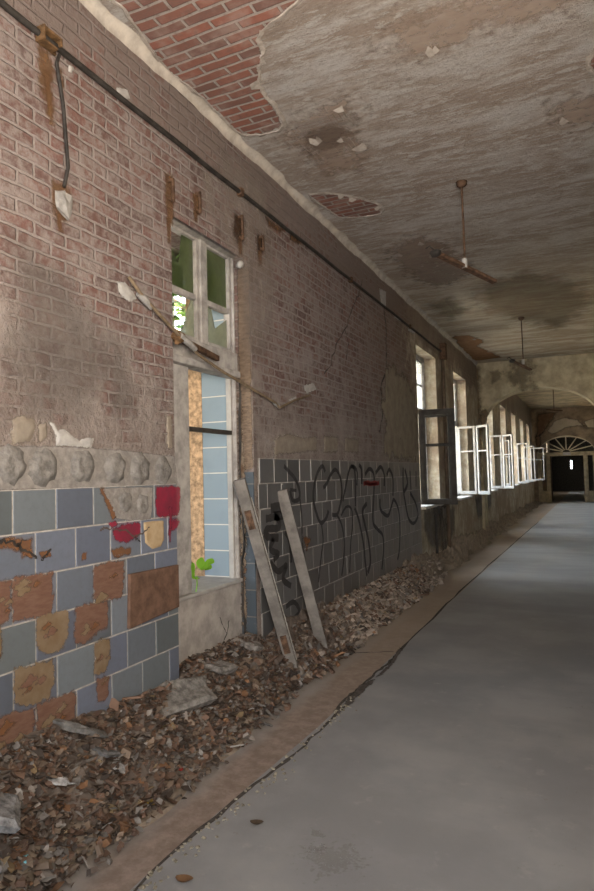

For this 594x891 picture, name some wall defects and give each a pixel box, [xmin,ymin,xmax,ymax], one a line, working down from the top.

corrosion [37,44,64,126]
flaking render [111,0,367,175]
flaking render [308,192,385,219]
peeling [453,335,501,360]
spalling [0,560,125,750]